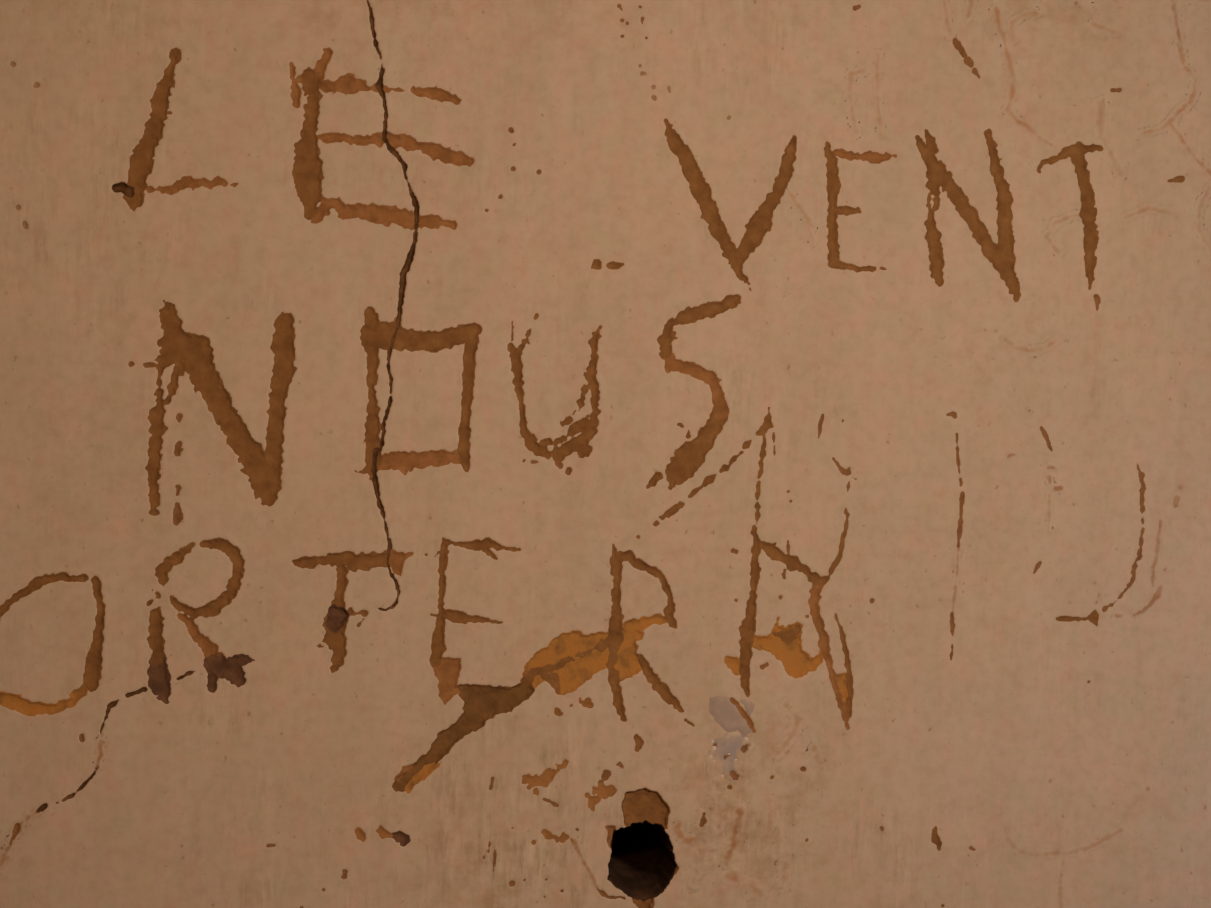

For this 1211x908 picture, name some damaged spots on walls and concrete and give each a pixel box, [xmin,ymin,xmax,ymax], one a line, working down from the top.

crack [367,0,420,611]
crack [176,671,195,680]
peeling [392,630,645,794]
peeling [724,656,740,676]
crack [0,687,148,874]
flaking render [522,759,569,807]
flaking render [584,761,624,811]
spalling [597,812,707,902]